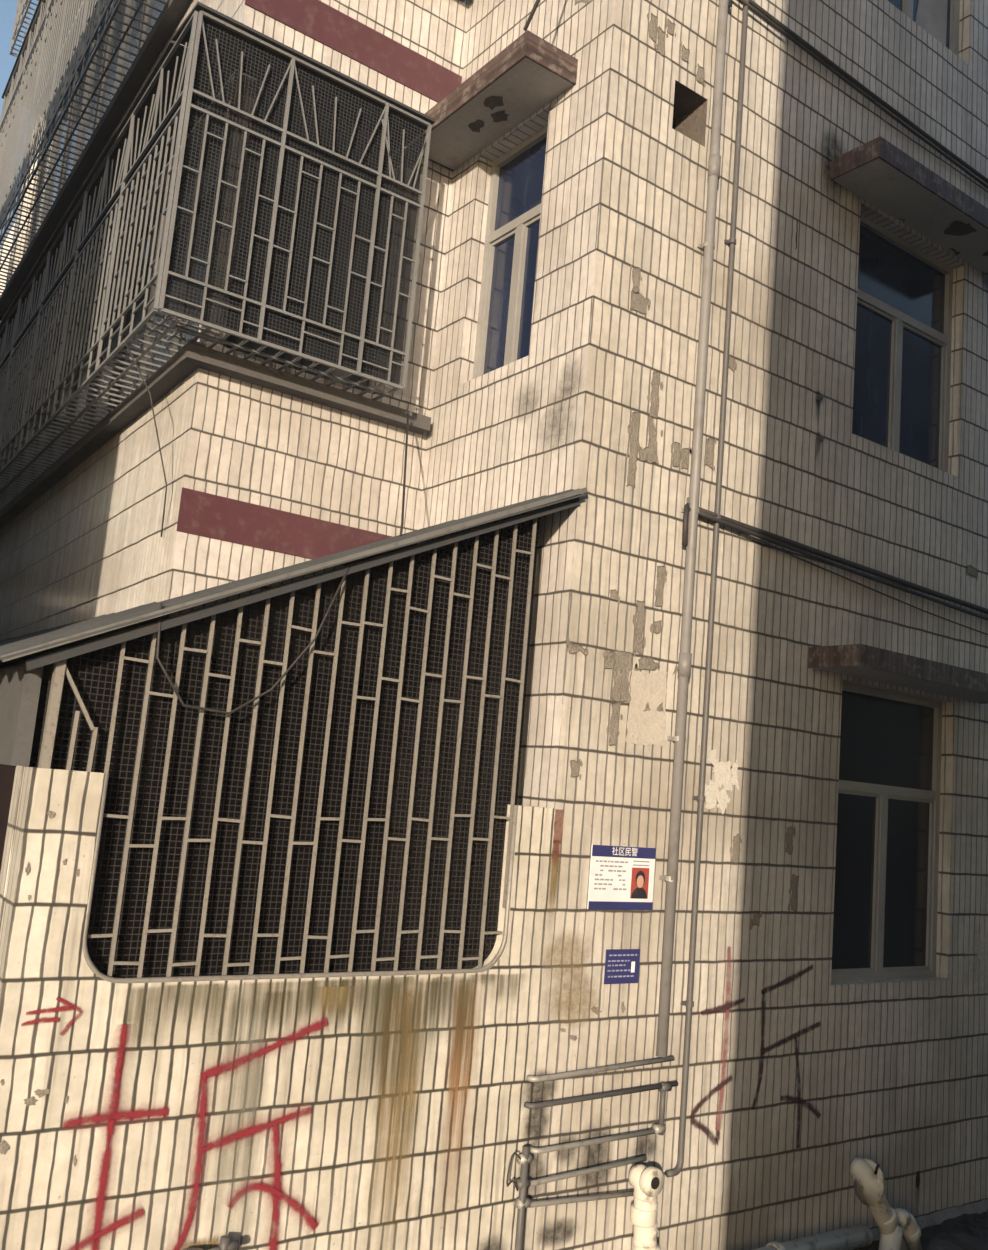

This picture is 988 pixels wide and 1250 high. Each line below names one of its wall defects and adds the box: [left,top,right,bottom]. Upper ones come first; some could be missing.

spalling [647,13,706,87]
peeling [468,96,509,133]
peeling [944,221,977,256]
spalling [630,265,651,314]
spalling [626,372,717,488]
spalling [566,636,588,656]
spalling [603,566,678,747]
spalling [570,759,583,780]
peeling [704,749,739,814]
rust [550,809,565,902]
rust [450,990,473,1120]
damp [543,1223,572,1242]